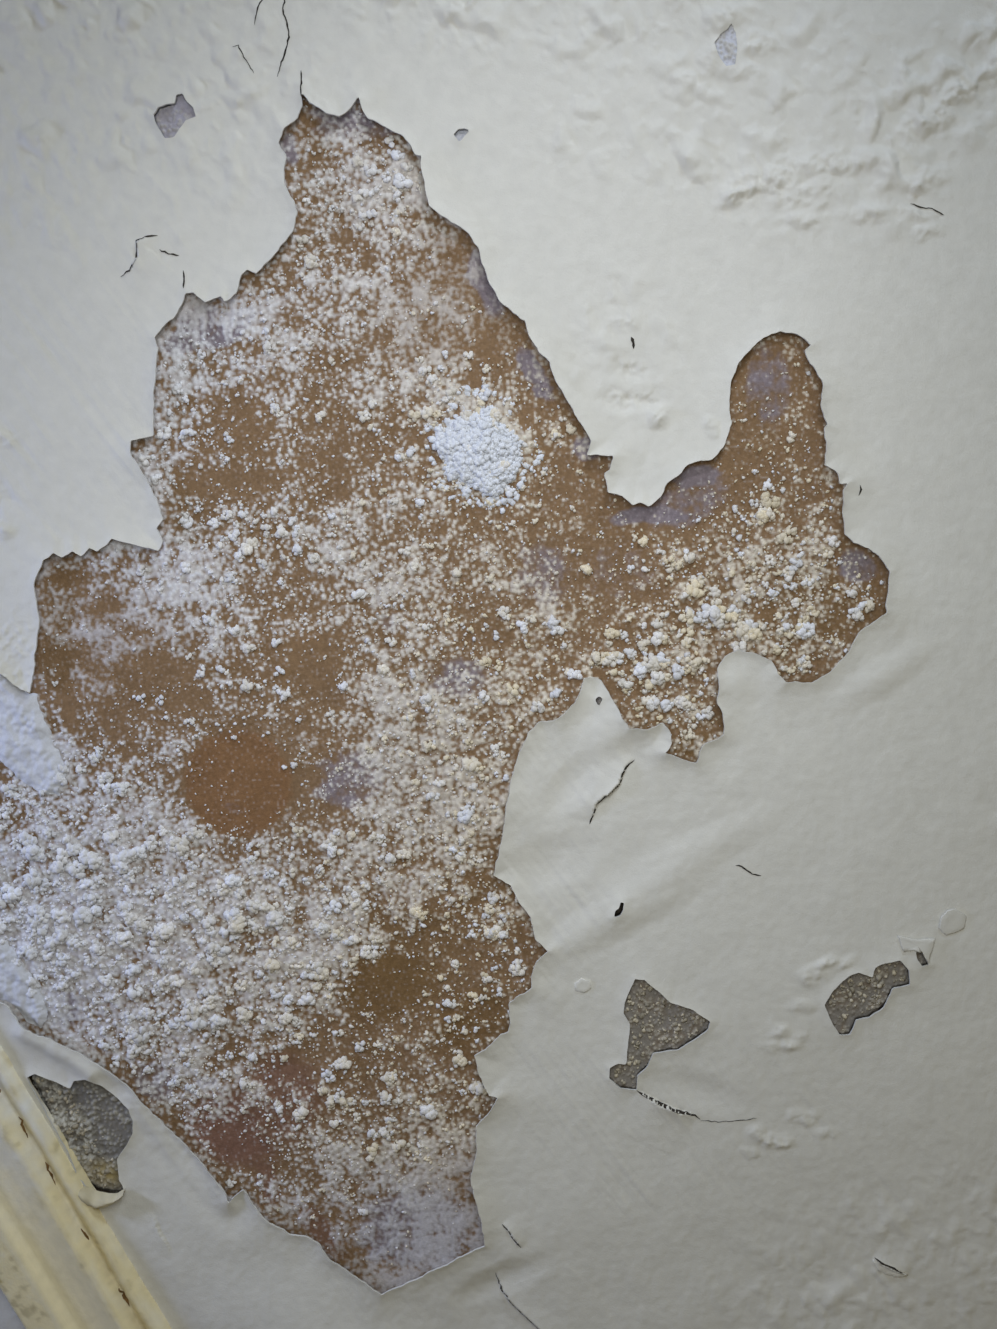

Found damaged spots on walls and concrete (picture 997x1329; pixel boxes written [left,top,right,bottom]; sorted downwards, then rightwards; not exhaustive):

peeling [148,85,204,148]
peeling [446,121,477,149]
damp [424,384,544,514]
peeling [608,897,633,924]
peeling [601,972,717,1096]
peeling [816,936,936,1041]
peeling [21,1068,139,1209]